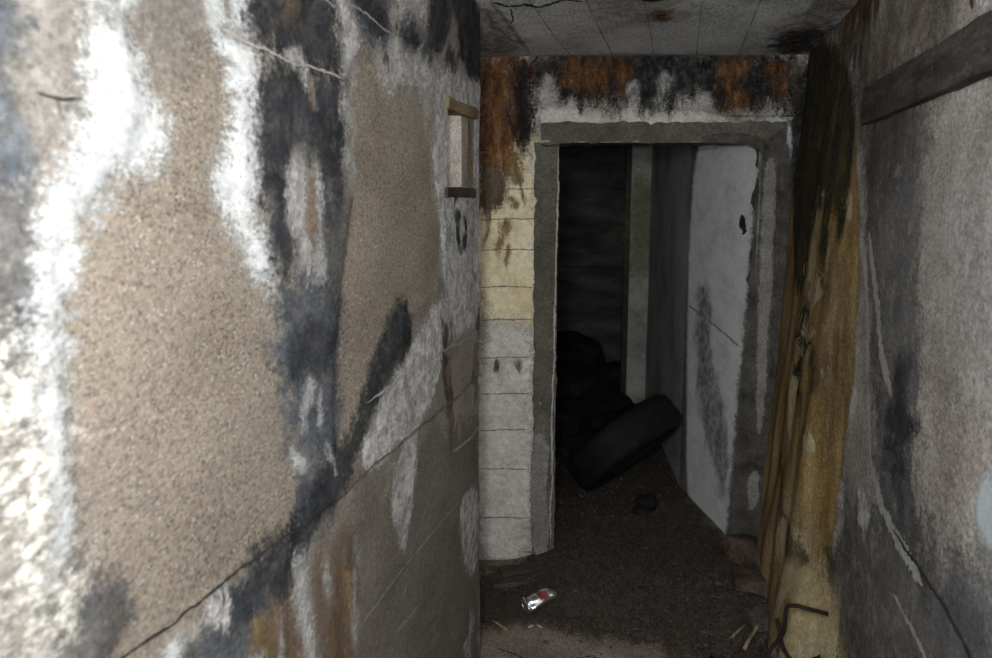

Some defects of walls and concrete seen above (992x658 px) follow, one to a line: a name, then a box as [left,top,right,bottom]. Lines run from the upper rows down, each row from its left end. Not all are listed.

leakage [93,0,140,13]
crack [490,0,583,54]
leakage [204,0,481,426]
rust [477,56,540,264]
leakage [696,0,938,536]
leakage [289,438,339,540]
crack [121,144,560,658]
leakage [773,478,992,658]
crack [857,224,972,658]